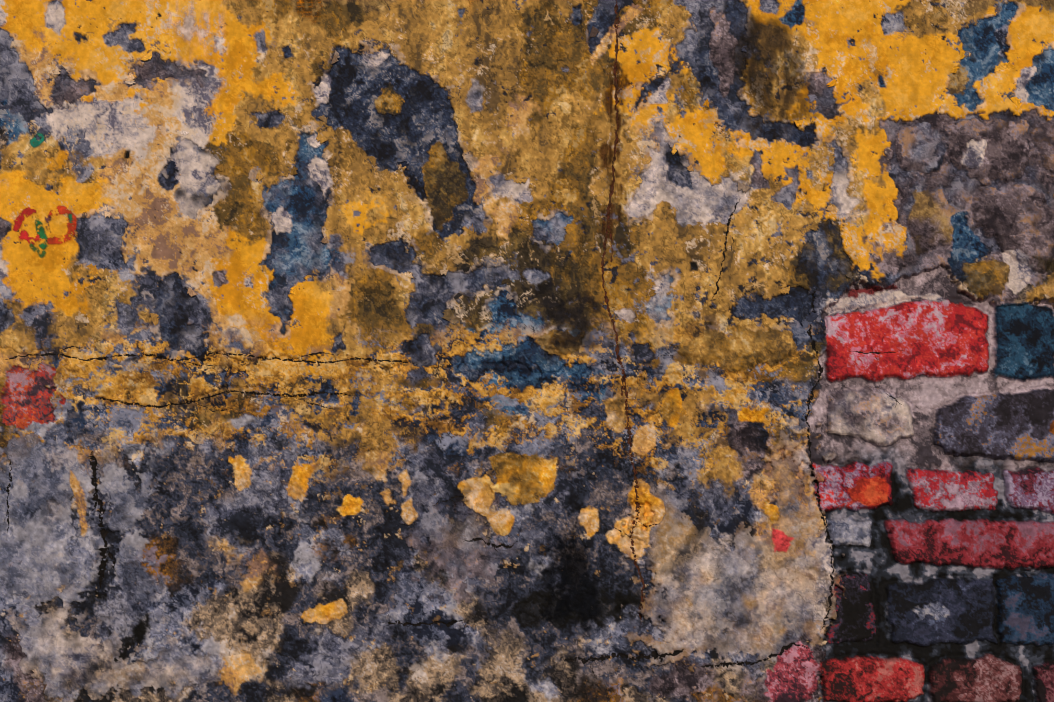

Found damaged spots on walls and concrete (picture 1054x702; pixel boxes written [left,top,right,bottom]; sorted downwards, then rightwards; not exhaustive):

peeling [0,23,208,122]
peeling [256,45,486,334]
rust [600,62,630,238]
peeling [627,0,816,227]
peeling [949,2,1054,111]
crack [90,451,116,589]
crack [5,346,417,366]
crack [95,390,355,412]
peeling [458,453,556,535]
crack [601,0,657,626]
crack [561,288,835,679]
flaking render [728,140,1054,702]